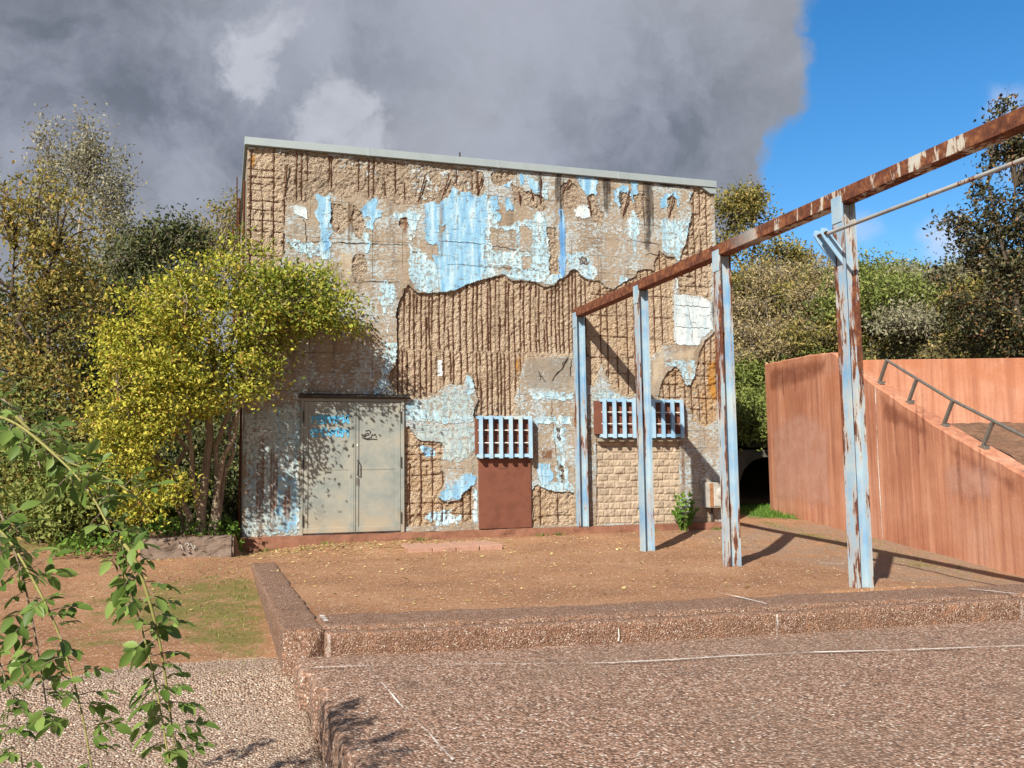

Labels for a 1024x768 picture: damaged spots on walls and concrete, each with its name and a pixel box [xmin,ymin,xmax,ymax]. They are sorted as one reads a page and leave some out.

spalling [242,148,718,537]
corrosion [708,362,716,399]